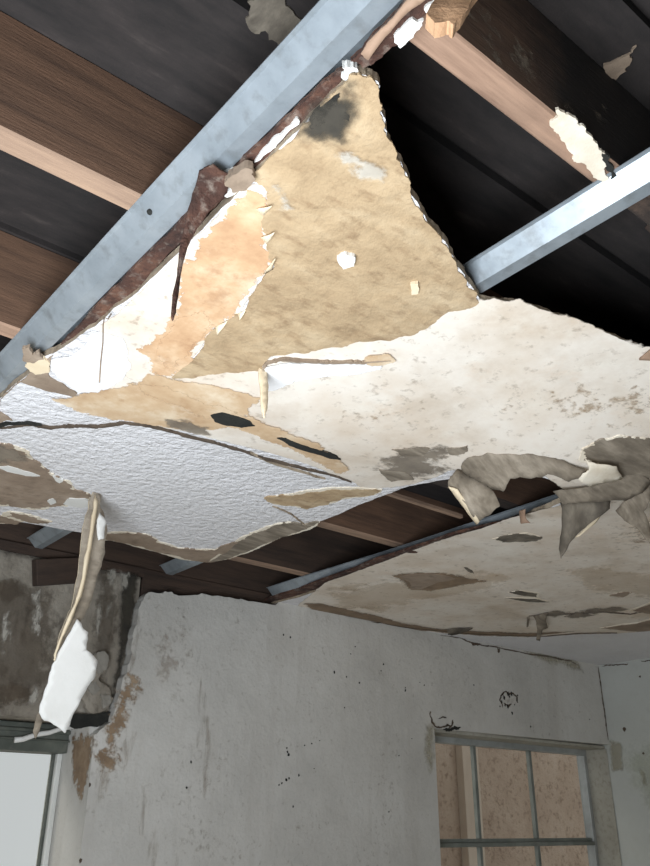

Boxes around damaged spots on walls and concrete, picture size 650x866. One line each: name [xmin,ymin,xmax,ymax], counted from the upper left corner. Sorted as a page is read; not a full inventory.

peeling [172,73,479,379]
peeling [0,332,131,400]
leakage [52,184,650,490]
peeling [0,442,92,525]
crack [0,421,352,483]
peeling [105,521,320,563]
crack [272,505,307,528]
peeling [264,487,383,509]
leakage [298,500,650,637]
peeling [492,532,542,543]
leakage [108,570,138,698]